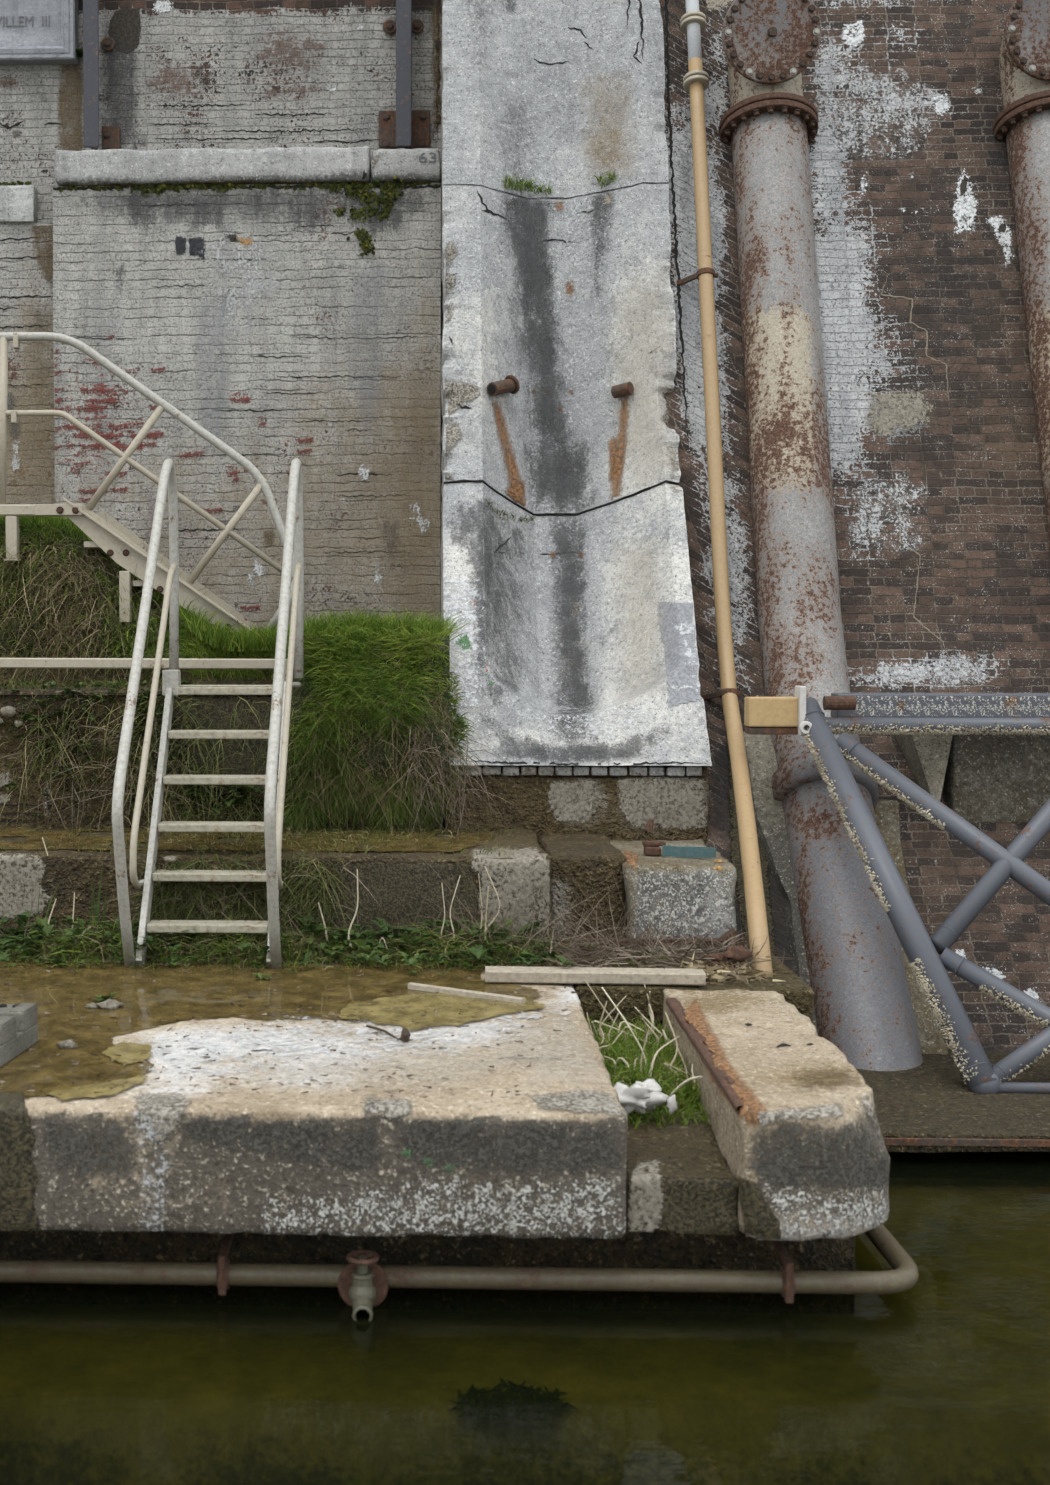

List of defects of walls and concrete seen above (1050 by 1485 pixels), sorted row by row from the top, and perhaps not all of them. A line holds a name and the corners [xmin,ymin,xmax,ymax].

crack [534,27,594,65]
crack [626,0,644,63]
leakage [842,20,866,51]
leakage [818,68,950,196]
leakage [952,168,1014,266]
peeling [54,335,165,503]
peeling [230,391,266,428]
peeling [295,437,314,456]
corrosion [494,403,525,509]
leakage [448,193,667,763]
corrosion [609,399,628,500]
leakage [865,389,933,437]